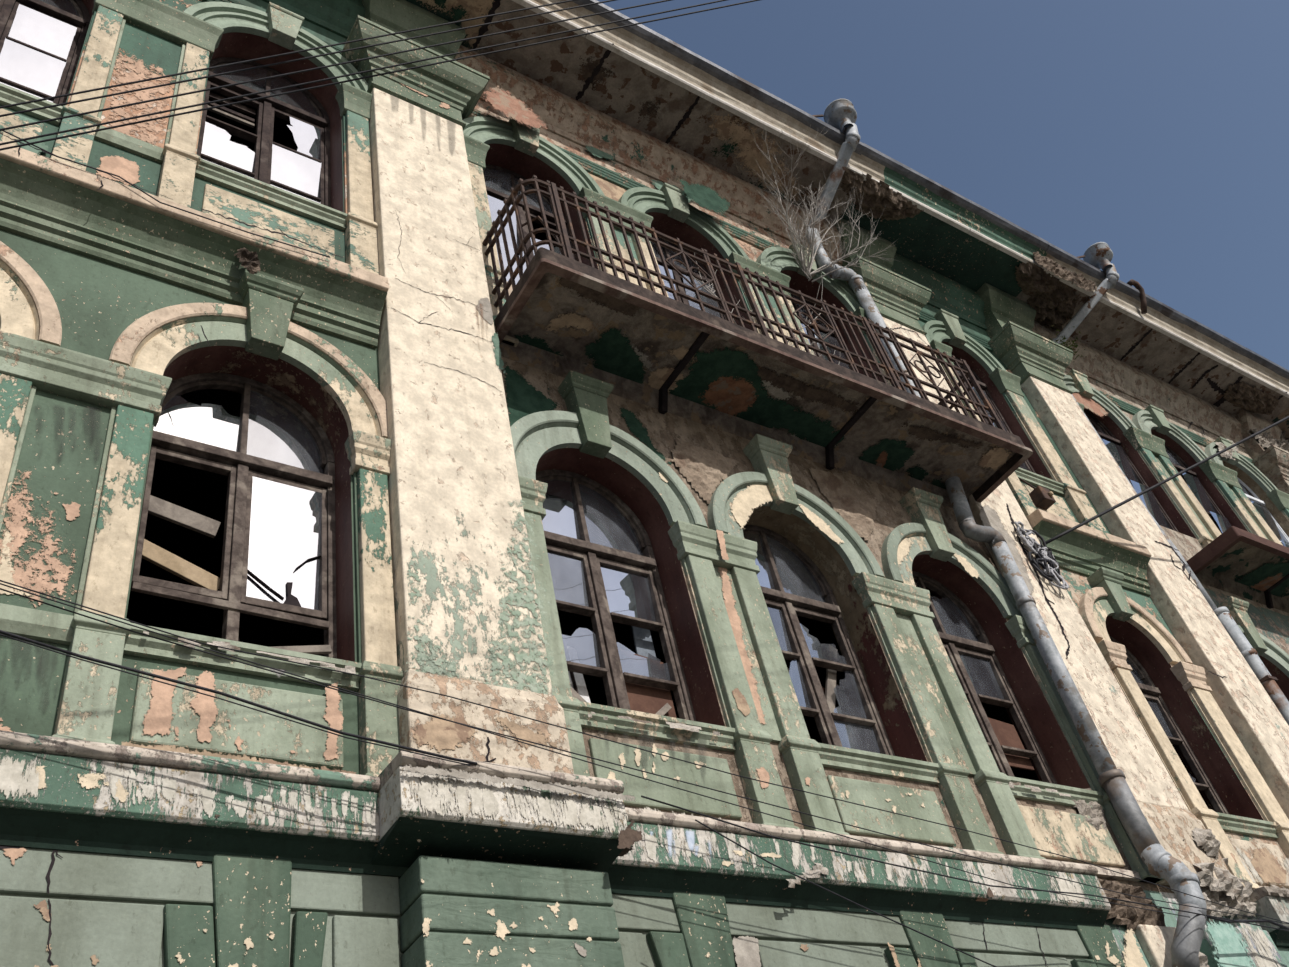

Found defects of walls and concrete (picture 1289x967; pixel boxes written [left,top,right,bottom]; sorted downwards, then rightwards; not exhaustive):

peeling [106,54,171,147]
spalling [96,155,140,186]
crack [393,215,491,342]
spalling [1014,251,1097,331]
peeling [492,312,838,447]
peeling [0,469,81,608]
peeling [406,488,567,701]
peeling [122,651,356,774]
peeling [78,772,129,802]
crack [0,845,63,966]
spalling [463,908,517,957]
flaking render [1183,827,1289,967]